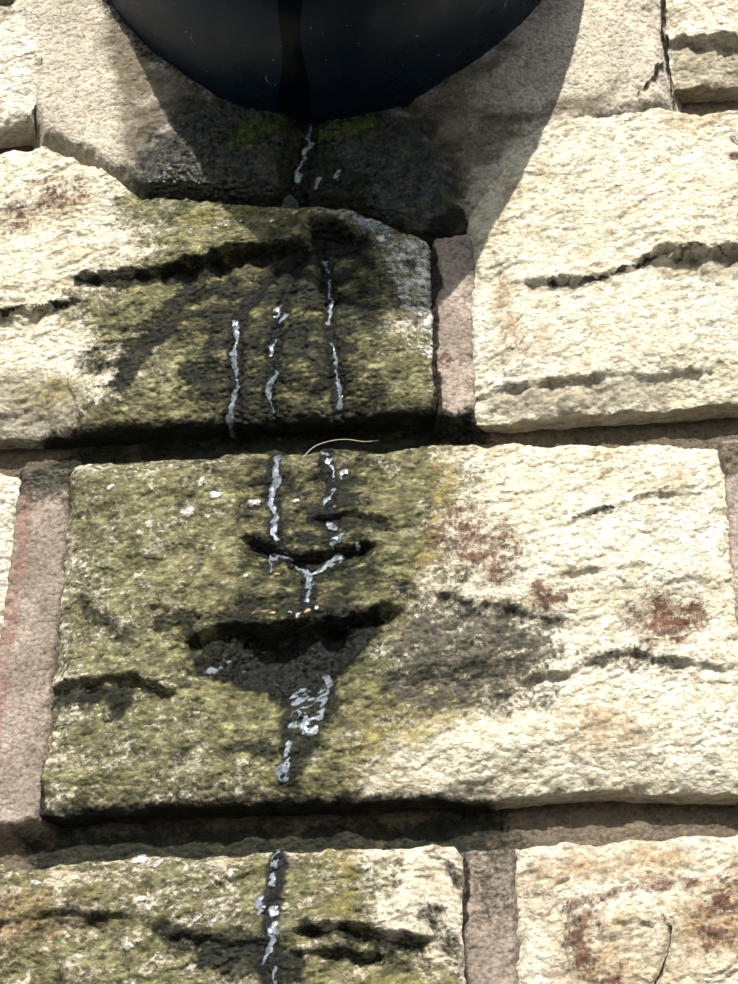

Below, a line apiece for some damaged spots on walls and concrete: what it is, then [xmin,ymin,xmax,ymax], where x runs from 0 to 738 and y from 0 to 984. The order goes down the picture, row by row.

crack [637,0,675,106]
leakage [250,448,348,620]
leakage [203,605,381,792]
leakage [255,849,290,984]
crack [654,911,672,984]